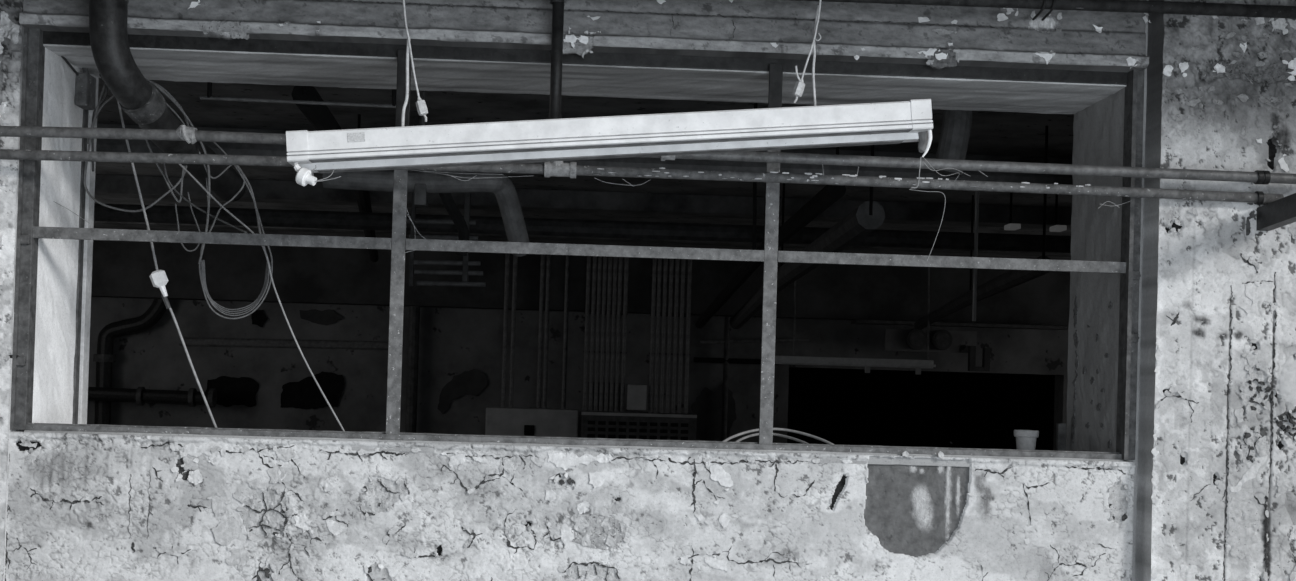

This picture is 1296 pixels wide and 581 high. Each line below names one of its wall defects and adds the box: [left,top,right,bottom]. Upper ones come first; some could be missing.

peeling [0,11,20,63]
flaking render [1256,125,1289,172]
crack [1156,253,1296,581]
crack [5,442,561,581]
crack [612,455,822,513]
crack [678,545,808,581]
flaking render [829,451,973,562]
crack [975,463,1126,581]